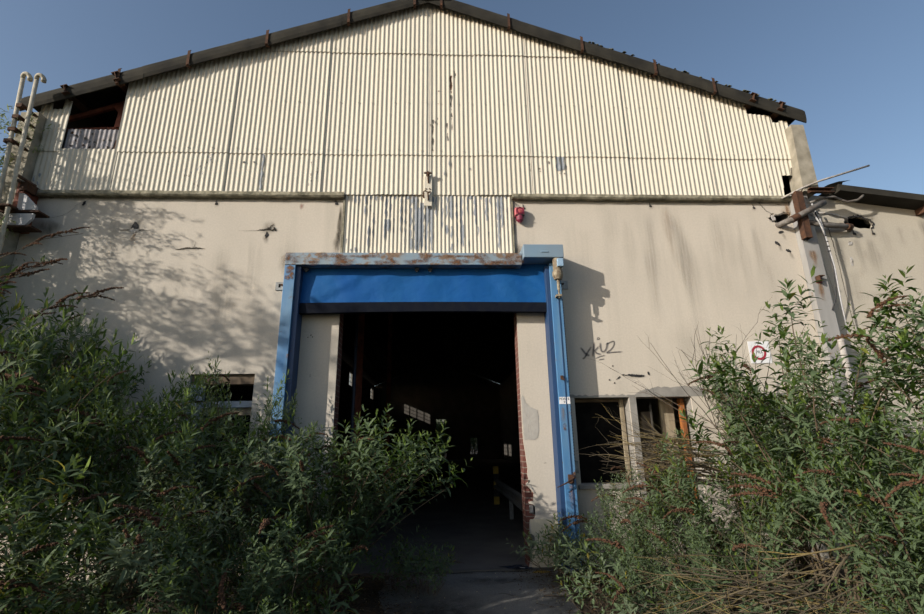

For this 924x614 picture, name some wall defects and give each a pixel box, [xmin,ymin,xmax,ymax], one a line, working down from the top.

peeling [529,157,567,174]
peeling [345,196,508,252]
corrosion [308,254,394,264]
corrosion [448,255,520,264]